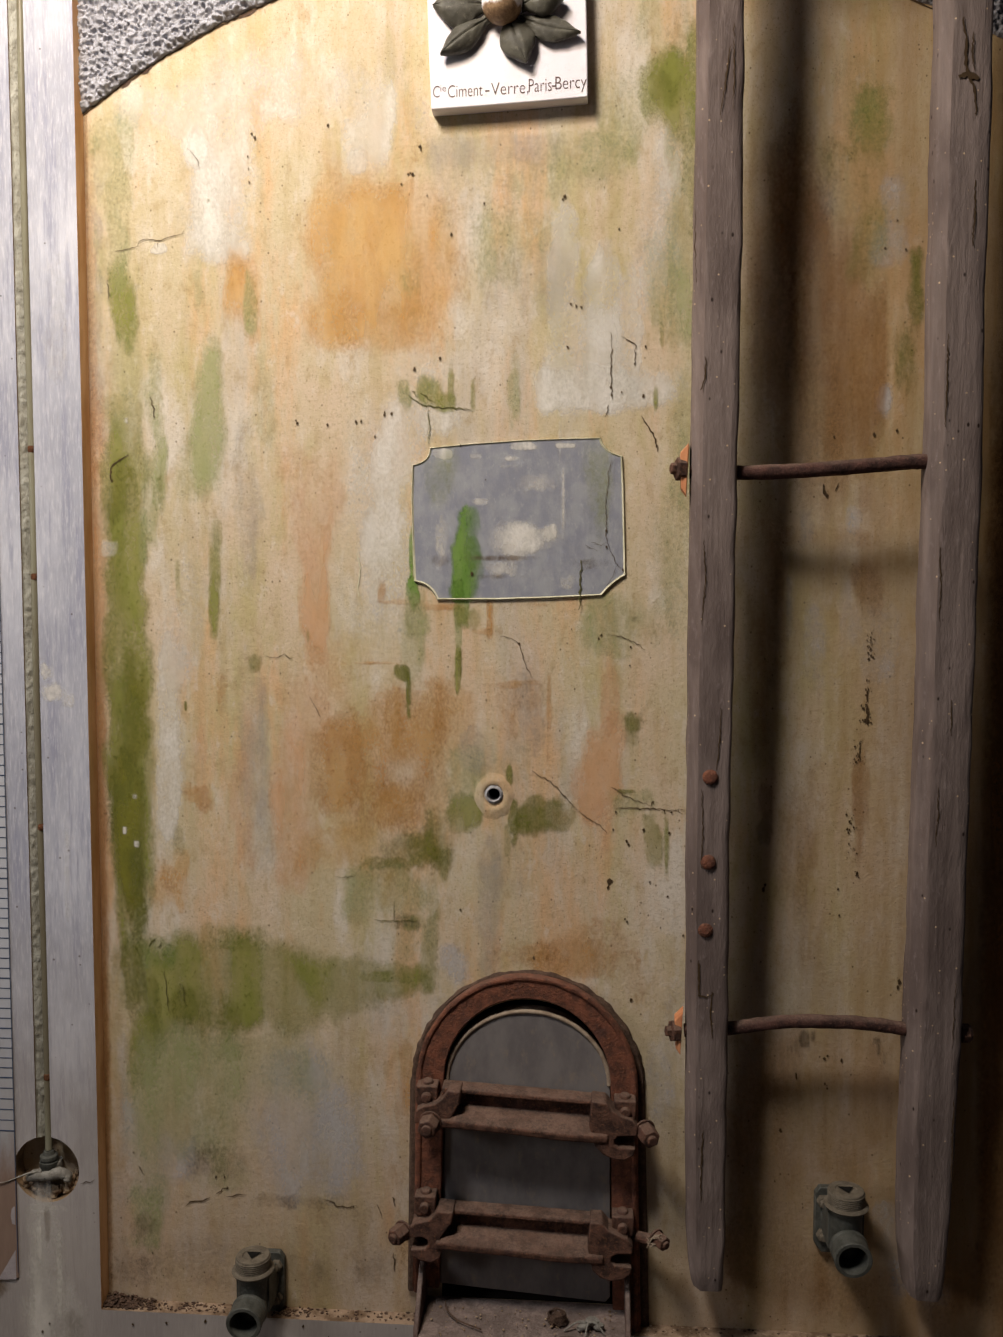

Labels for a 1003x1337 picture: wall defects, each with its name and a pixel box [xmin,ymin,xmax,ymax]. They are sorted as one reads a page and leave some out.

crack [107,230,184,299]
crack [533,771,683,831]
leakage [96,661,146,1232]